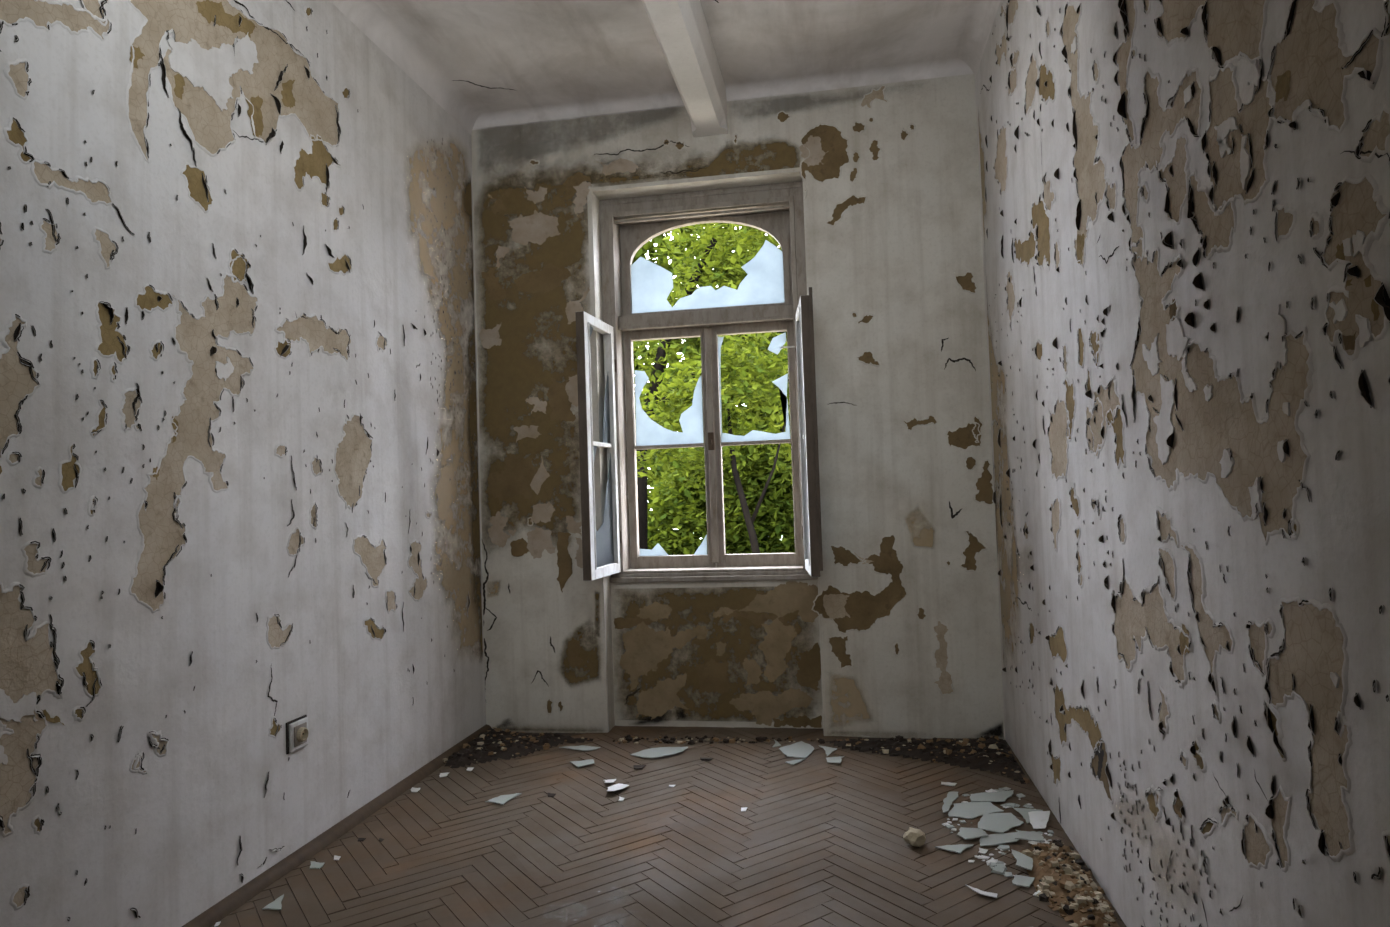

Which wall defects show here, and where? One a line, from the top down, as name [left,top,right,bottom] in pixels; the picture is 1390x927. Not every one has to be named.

peeling [0,0,112,101]
peeling [3,116,135,269]
peeling [0,313,98,517]
peeling [89,243,258,613]
peeling [274,312,351,362]
peeling [274,399,438,641]
peeling [374,320,426,354]
peeling [985,0,1390,885]
peeling [0,518,103,838]
peeling [129,730,169,775]
peeling [256,613,294,650]
peeling [811,533,955,696]